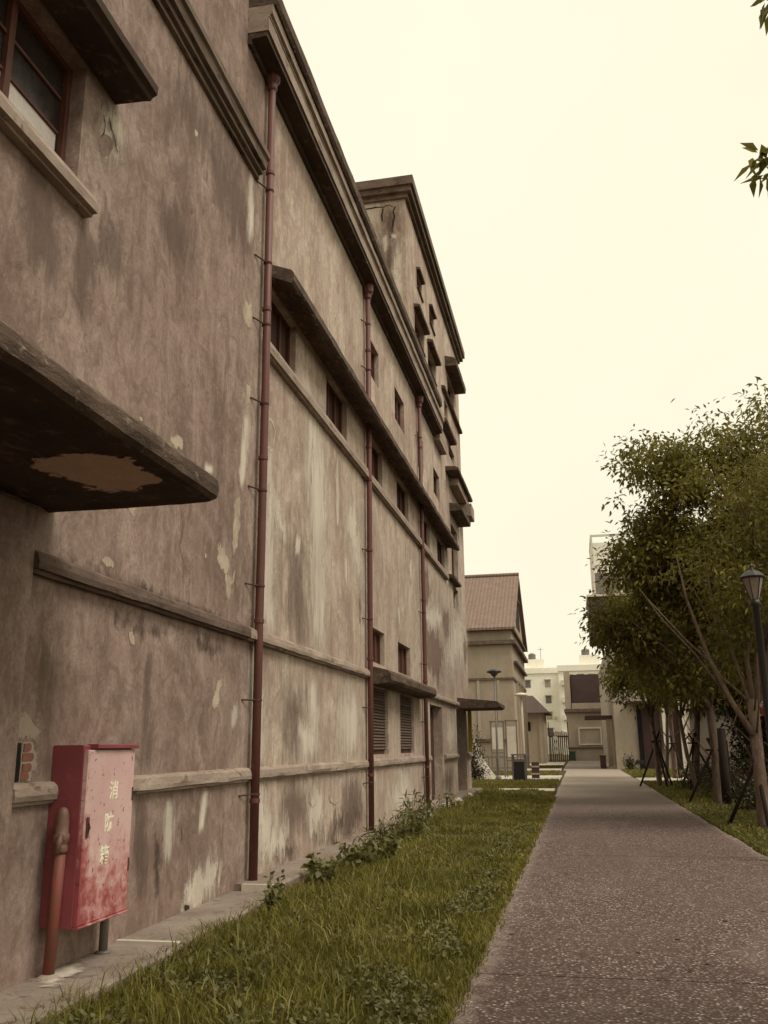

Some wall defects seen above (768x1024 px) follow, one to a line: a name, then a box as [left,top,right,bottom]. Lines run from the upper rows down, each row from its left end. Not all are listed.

crack [366,204,396,269]
peeling [21,453,163,493]
peeling [170,435,183,450]
peeling [205,384,251,599]
leakage [258,419,286,634]
leakage [295,414,364,647]
flaking render [14,711,42,783]
leakage [199,791,207,833]
leakage [258,780,293,870]
leakage [306,782,361,844]